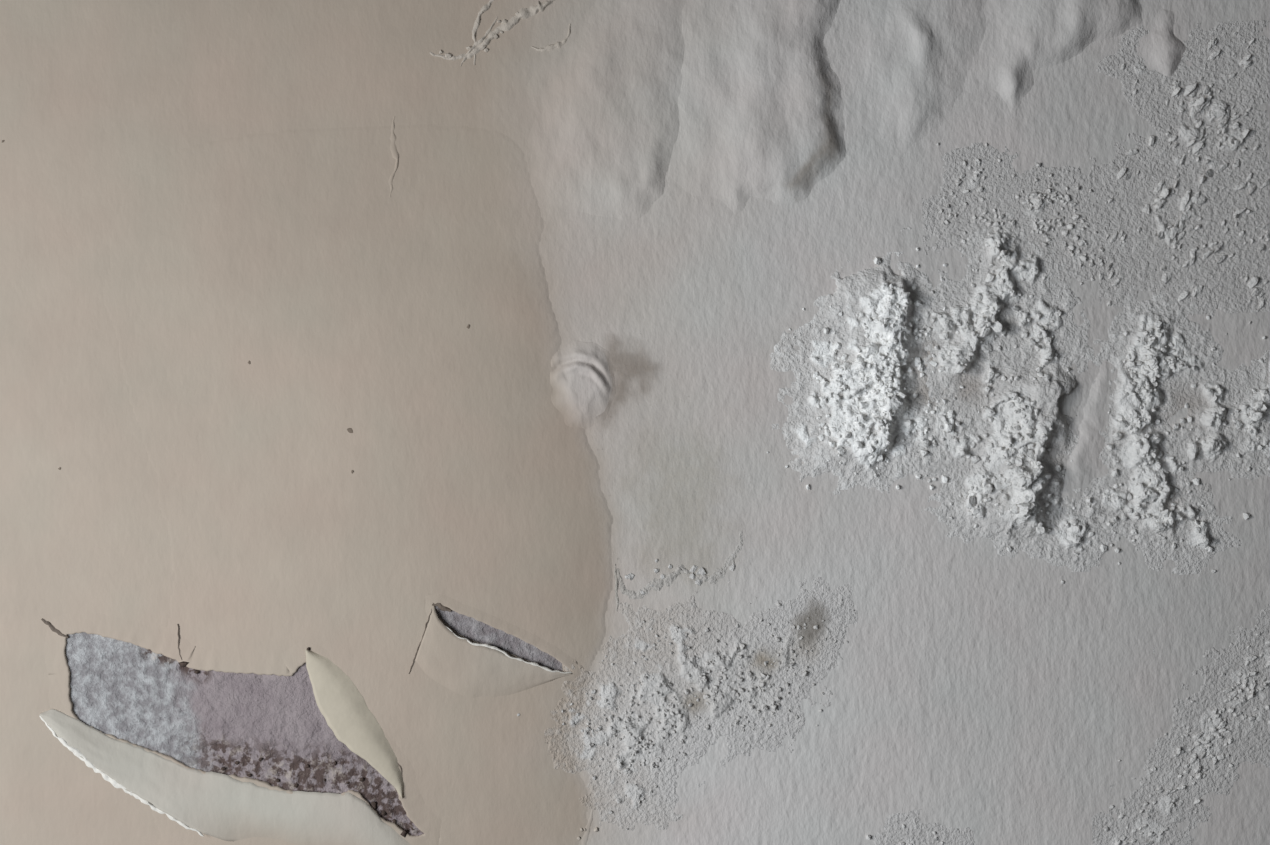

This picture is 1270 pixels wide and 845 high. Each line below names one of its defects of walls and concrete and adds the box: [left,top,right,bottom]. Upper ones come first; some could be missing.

crack [430,0,571,66]
peeling [40,611,442,845]
spalling [408,565,858,832]